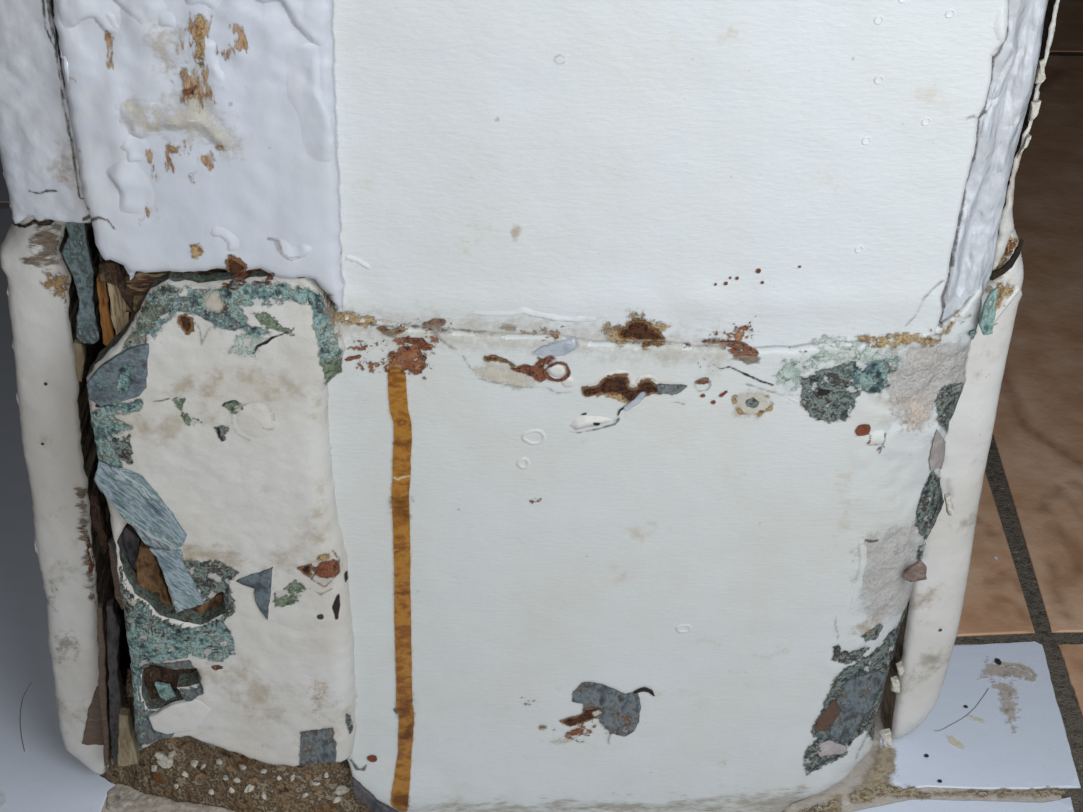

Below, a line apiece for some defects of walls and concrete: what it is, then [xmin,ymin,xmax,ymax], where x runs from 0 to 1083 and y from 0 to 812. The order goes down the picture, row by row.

rust [171,14,248,109]
peeling [1017,100,1041,158]
rust [41,222,101,344]
peeling [178,313,203,342]
crack [350,322,480,348]
rust [683,316,760,364]
rust [90,365,143,468]
peeling [94,434,204,614]
rust [104,254,451,812]
peeling [236,567,273,620]
peeling [297,554,340,595]
peeling [553,682,654,742]